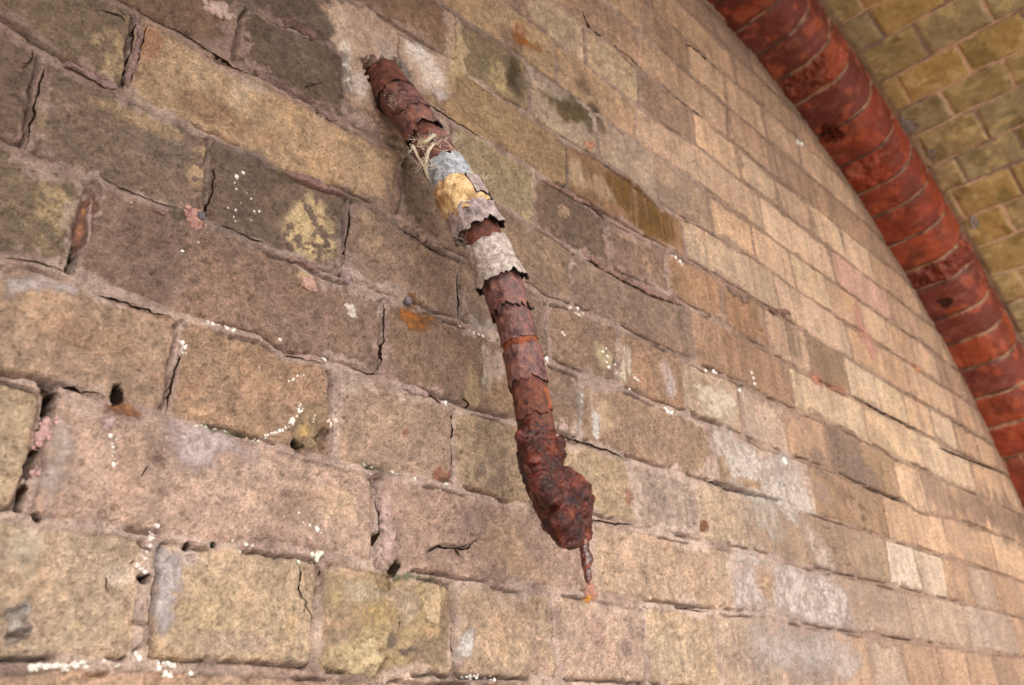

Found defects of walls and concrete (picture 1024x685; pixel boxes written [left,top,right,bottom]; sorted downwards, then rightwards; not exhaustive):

crack [22,9,259,149]
corrosion [400,293,434,331]
crack [349,305,385,375]
crack [426,538,478,555]
crack [298,569,321,624]